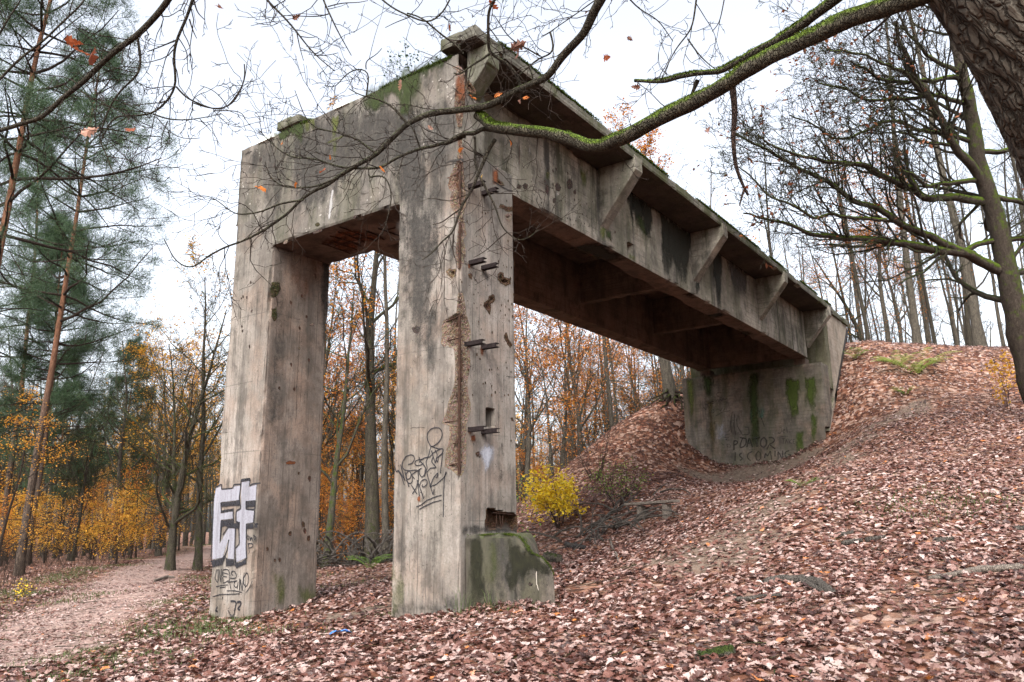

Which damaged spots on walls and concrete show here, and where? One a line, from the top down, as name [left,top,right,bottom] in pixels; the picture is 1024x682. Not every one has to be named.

leakage [627,192,699,298]
spalling [441,140,516,476]
leakage [463,525,535,601]